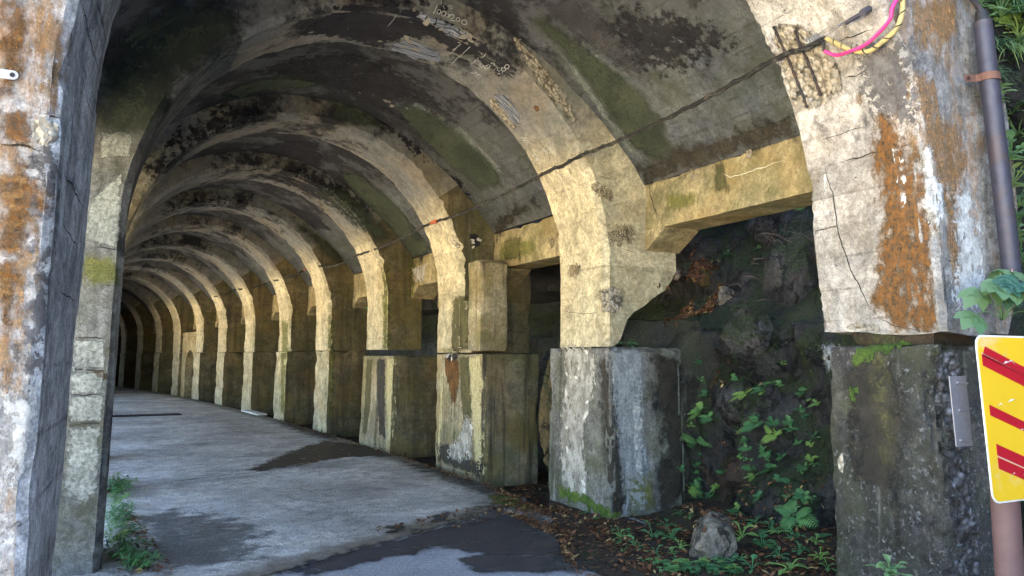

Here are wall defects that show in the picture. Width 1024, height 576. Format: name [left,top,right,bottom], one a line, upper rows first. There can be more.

leakage [141,0,517,202]
spalling [391,39,441,64]
spalling [489,94,520,129]
spalling [513,37,576,122]
leakage [534,0,795,193]
spalling [772,24,842,111]
crack [781,144,916,330]
rust [444,357,459,416]
peeling [447,415,473,462]
leakage [599,346,701,524]